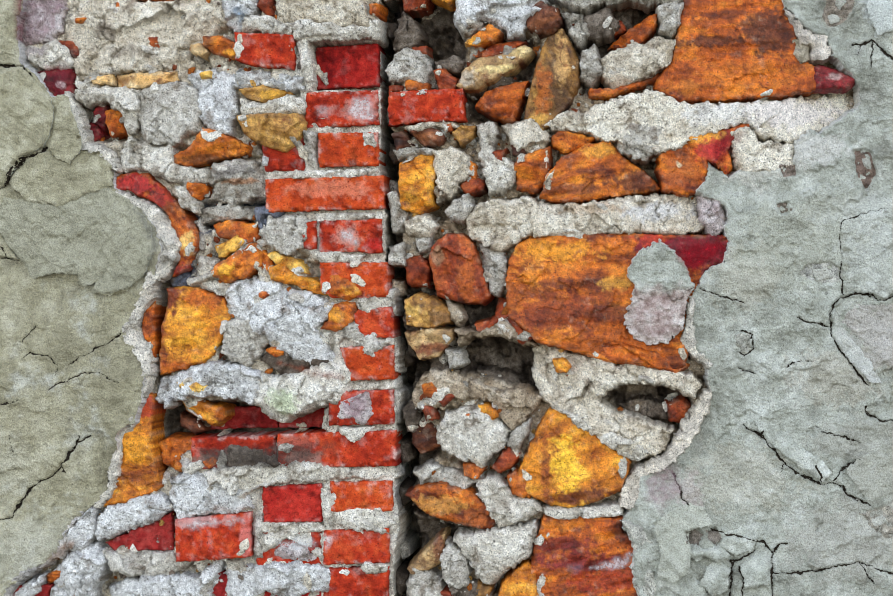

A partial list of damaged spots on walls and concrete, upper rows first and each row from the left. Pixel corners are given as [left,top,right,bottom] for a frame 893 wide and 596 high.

spalling [783,0,855,65]
peeling [866,0,893,36]
crack [4,147,48,188]
crack [22,325,121,391]
peeling [0,68,182,596]
peeling [623,238,713,370]
crack [797,208,893,385]
crack [0,435,91,520]
peeling [618,388,771,596]
peeling [755,419,832,482]
crack [743,424,871,506]
crack [710,528,893,596]